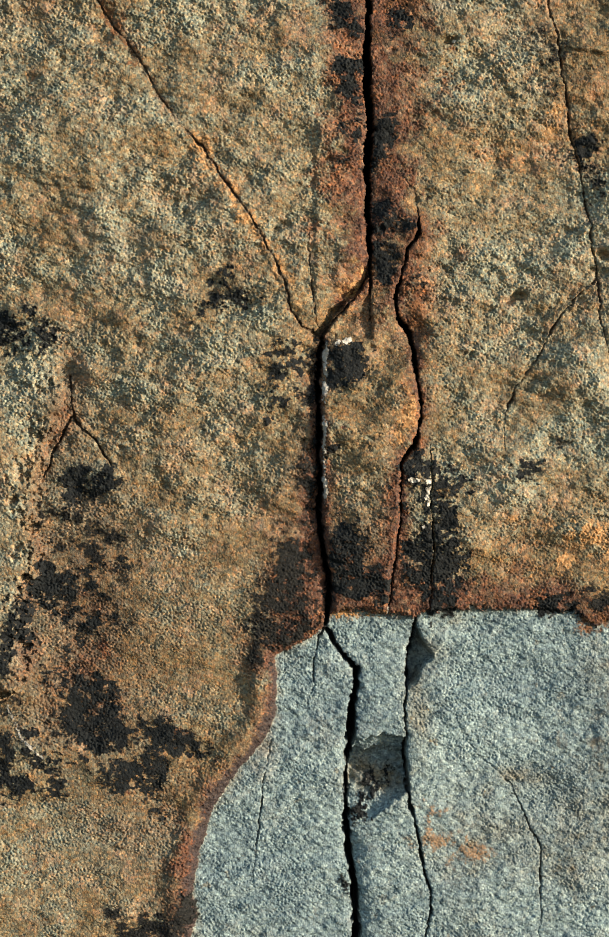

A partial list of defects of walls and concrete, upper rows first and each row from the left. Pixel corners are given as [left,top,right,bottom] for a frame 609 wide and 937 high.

crack [503,0,609,451]
crack [42,375,113,478]
crack [96,0,436,937]
spalling [191,605,609,937]
crack [448,702,543,937]